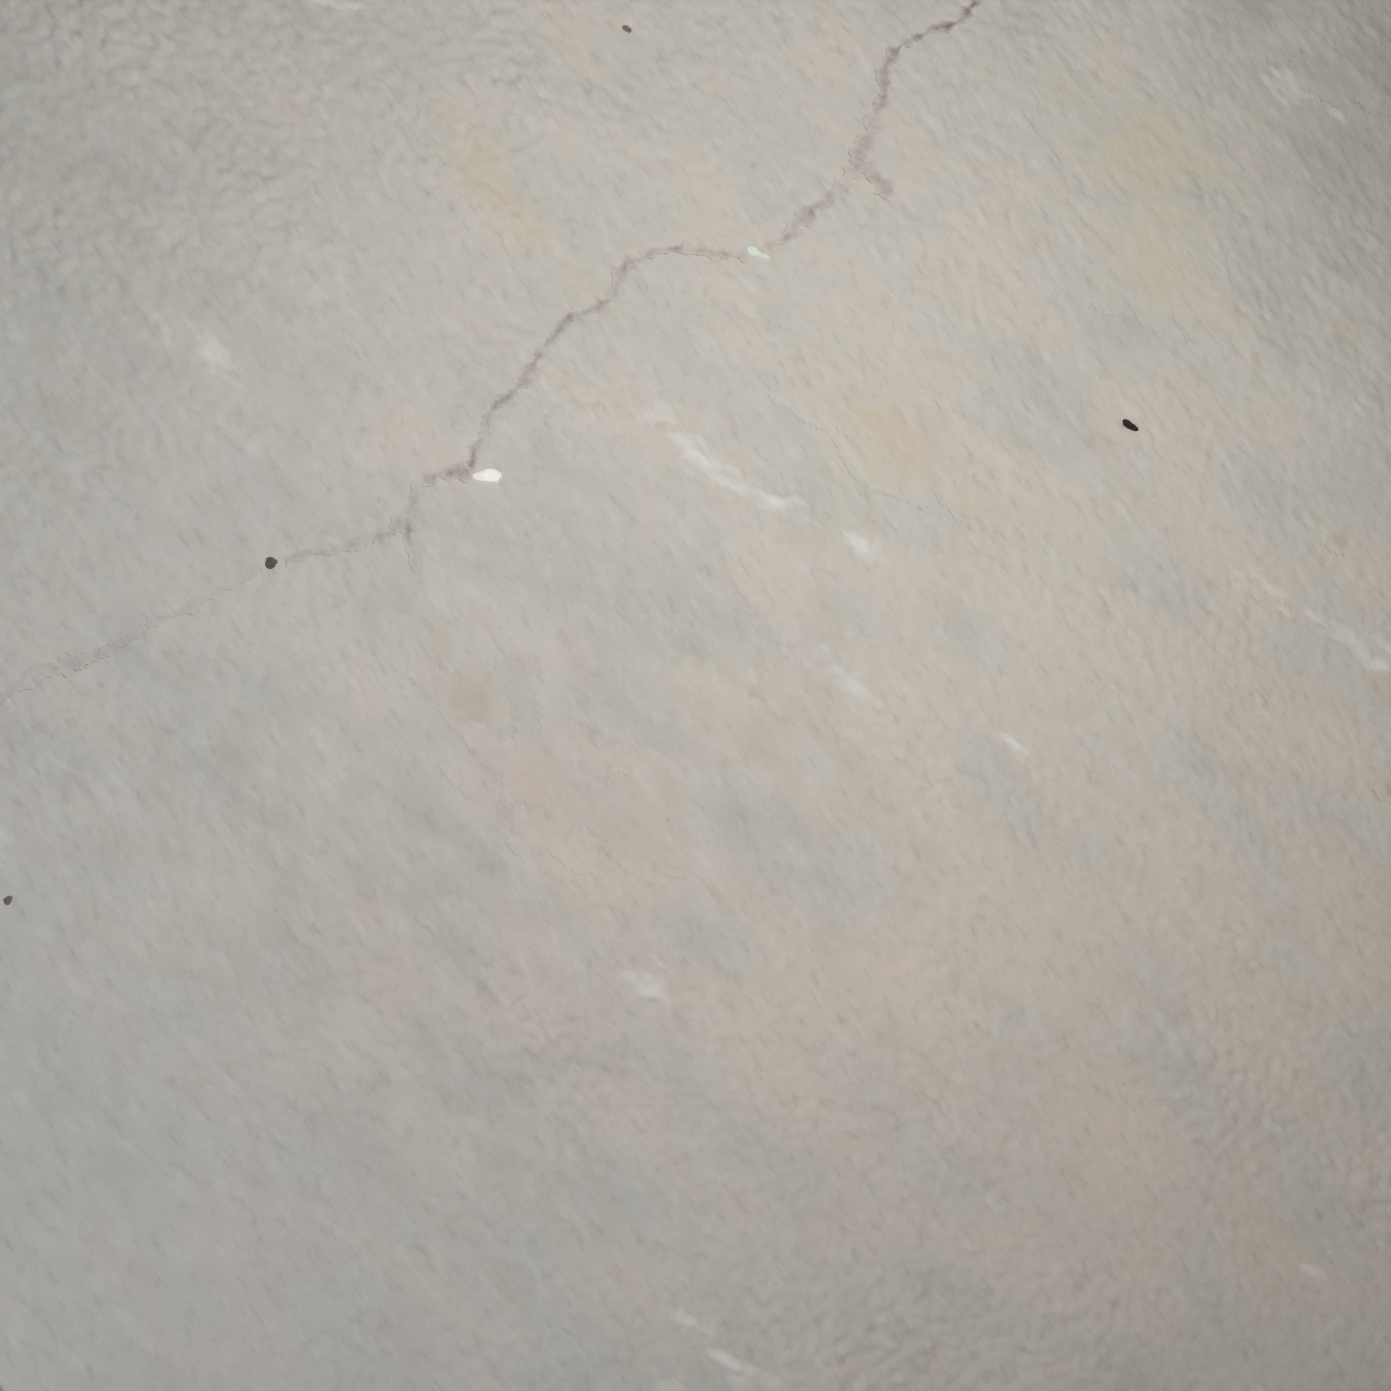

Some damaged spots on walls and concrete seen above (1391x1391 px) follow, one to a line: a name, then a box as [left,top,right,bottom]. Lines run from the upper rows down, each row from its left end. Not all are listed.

crack [284,0,983,575]